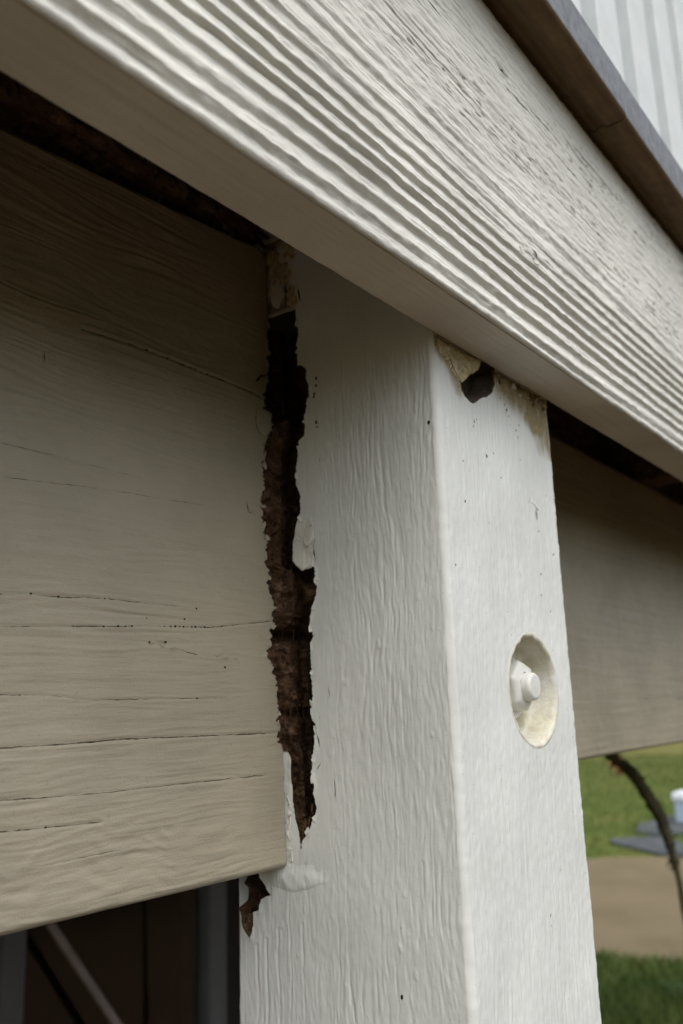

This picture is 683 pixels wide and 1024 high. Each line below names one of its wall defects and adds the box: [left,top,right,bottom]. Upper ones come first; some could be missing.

peeling [243,217,299,314]
spalling [437,338,547,411]